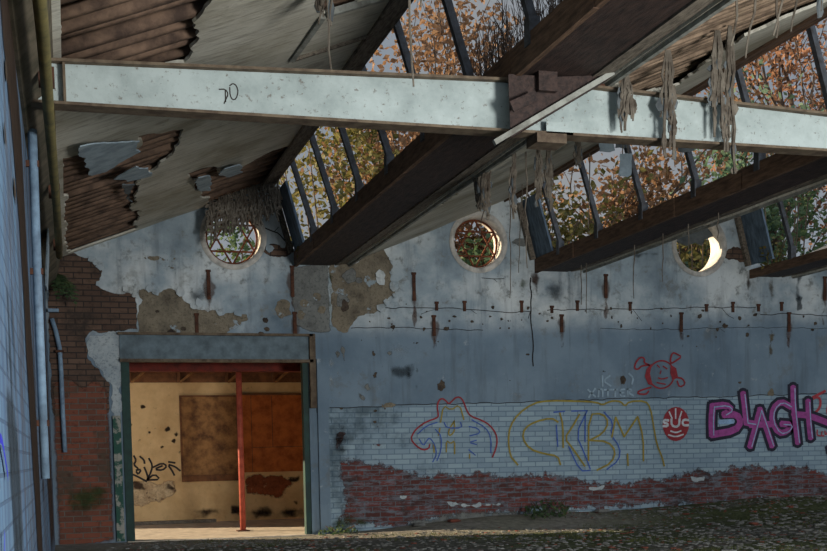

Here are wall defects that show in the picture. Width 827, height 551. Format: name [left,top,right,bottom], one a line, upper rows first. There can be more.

flaking render [1,0,248,551]
peeling [337,458,827,527]